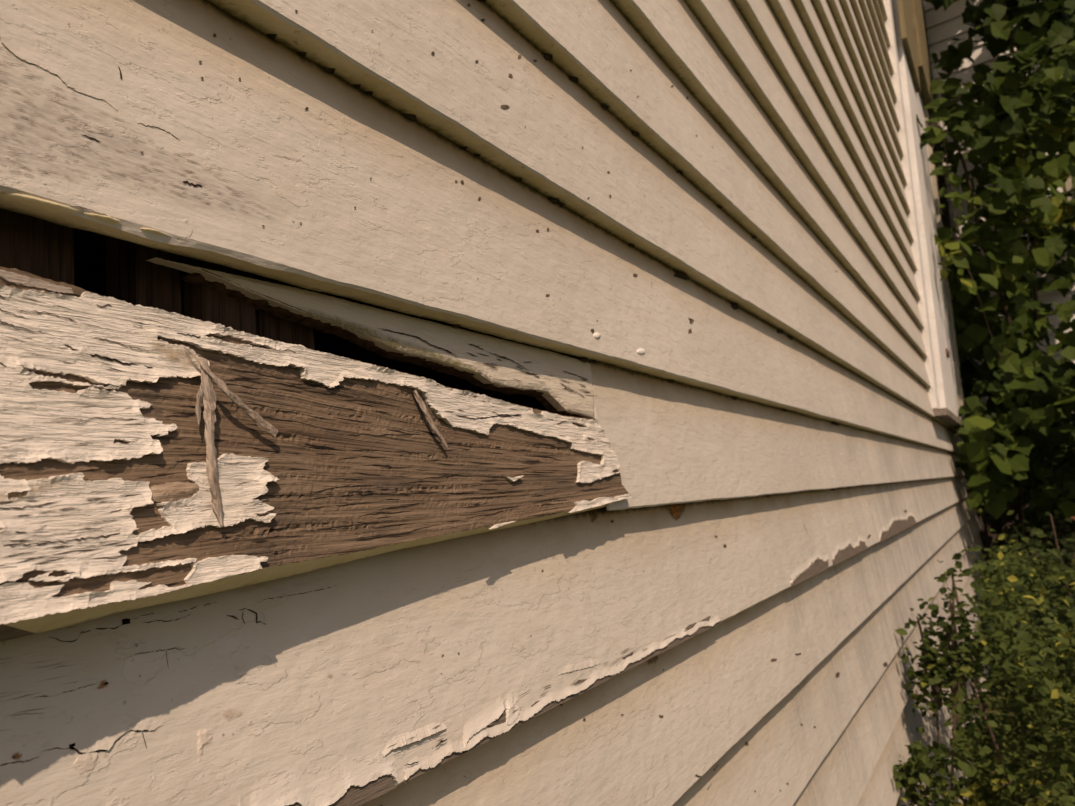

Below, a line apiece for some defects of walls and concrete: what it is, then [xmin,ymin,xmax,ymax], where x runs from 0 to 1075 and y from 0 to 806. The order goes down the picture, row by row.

crack [0,12,262,216]
peeling [0,269,632,624]
peeling [790,511,917,587]
crack [0,578,338,766]
peeling [229,615,723,806]